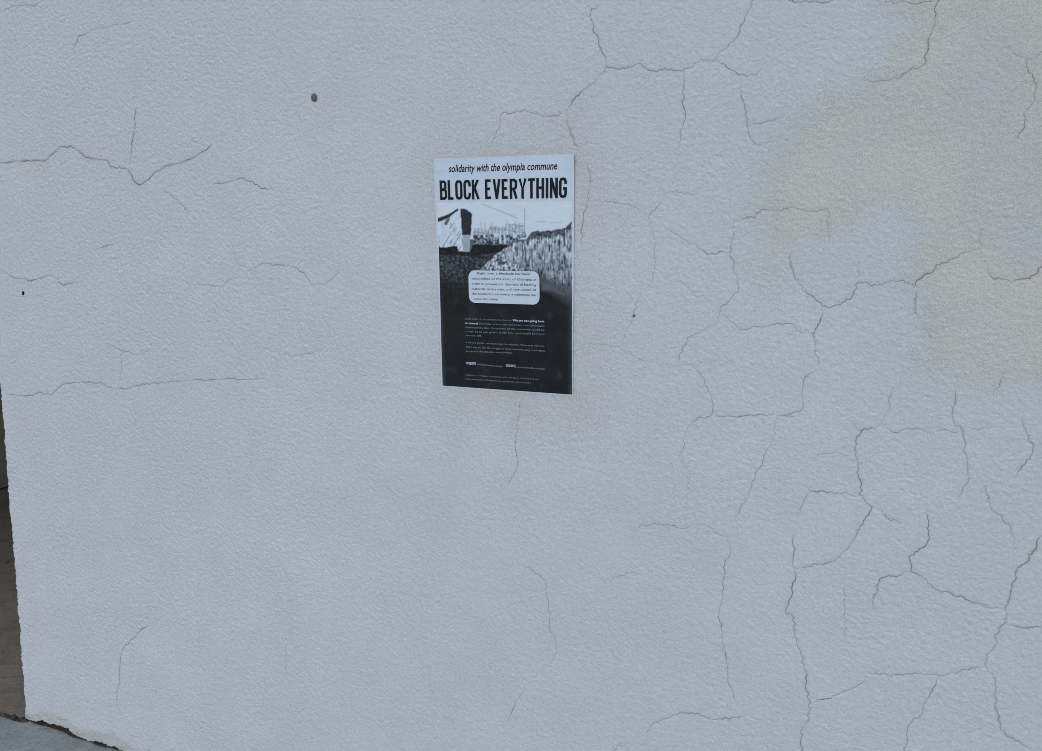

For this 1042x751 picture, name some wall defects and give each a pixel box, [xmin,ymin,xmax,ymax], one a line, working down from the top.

crack [877,516,930,591]